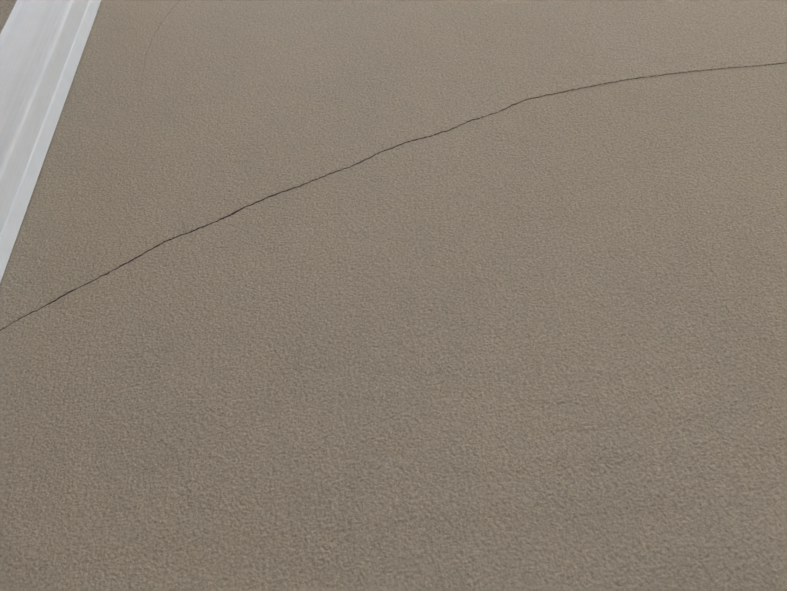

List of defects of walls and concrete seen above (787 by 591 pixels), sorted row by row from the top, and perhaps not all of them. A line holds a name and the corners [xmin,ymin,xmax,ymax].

crack [0,62,787,331]